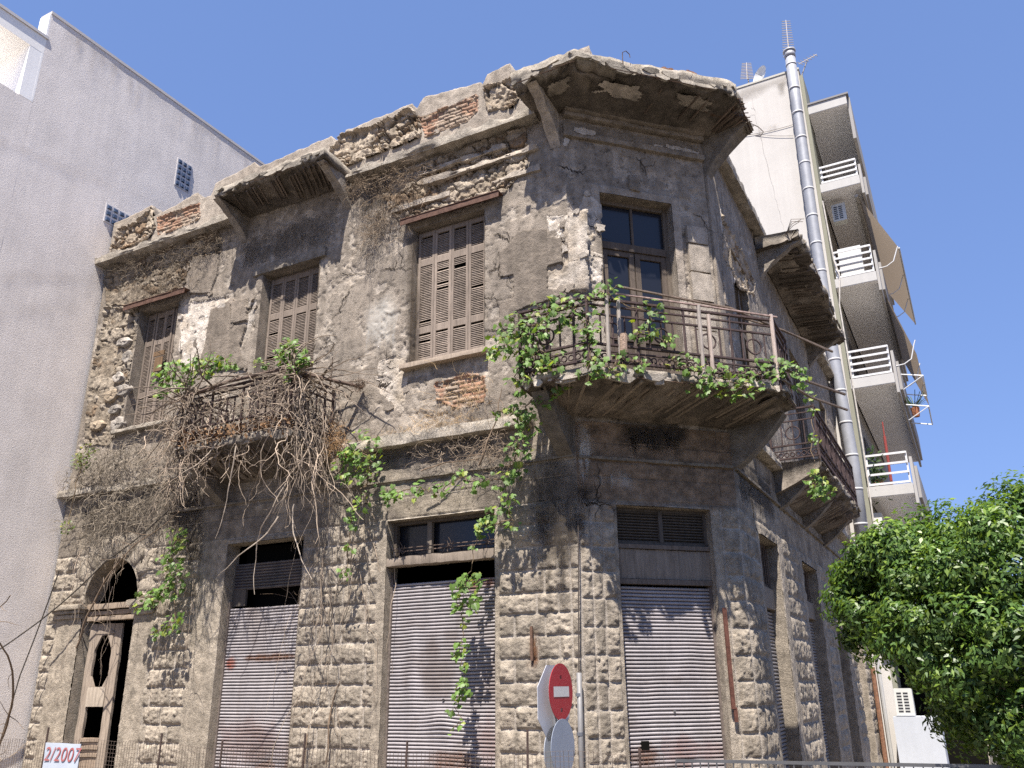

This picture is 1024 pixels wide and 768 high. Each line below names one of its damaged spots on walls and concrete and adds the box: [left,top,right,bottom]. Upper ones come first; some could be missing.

spalling [215,46,764,197]
spalling [382,126,530,222]
flaking render [498,190,605,330]
spalling [84,203,258,448]
spalling [434,371,487,409]
leakage [625,424,685,448]
crack [581,465,622,521]